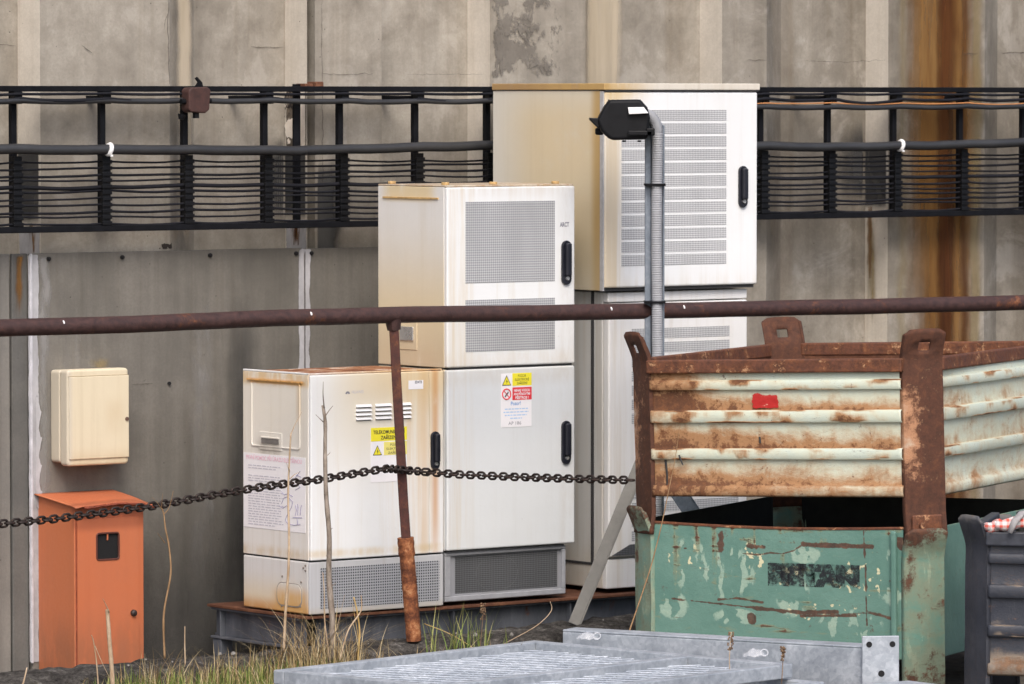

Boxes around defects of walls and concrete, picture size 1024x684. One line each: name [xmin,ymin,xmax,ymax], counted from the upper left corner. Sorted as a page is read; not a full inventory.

peeling [492,0,561,77]
corrosion [913,0,979,297]
corrosion [16,233,34,306]
corrosion [920,311,978,341]